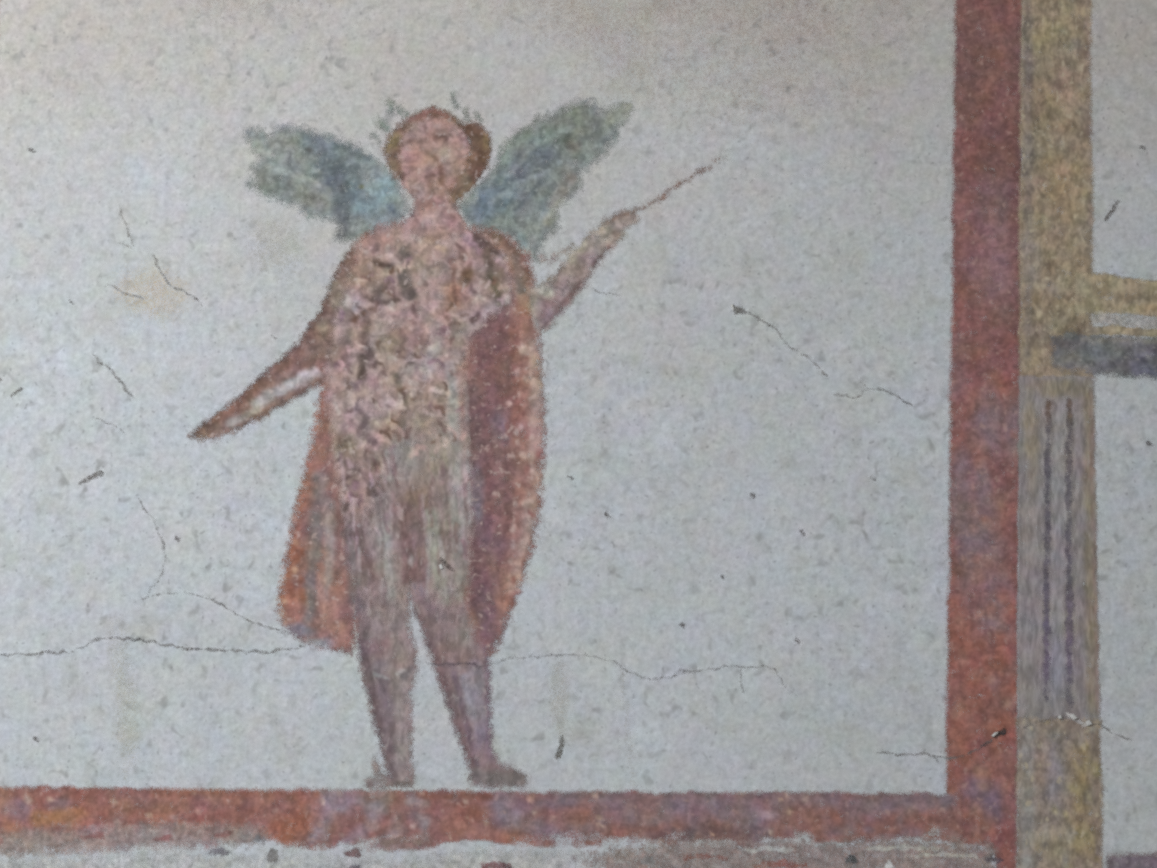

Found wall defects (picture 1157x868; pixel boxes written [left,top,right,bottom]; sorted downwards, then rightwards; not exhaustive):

crack [748,311,911,405]
crack [426,653,796,695]
peeling [0,816,1003,868]